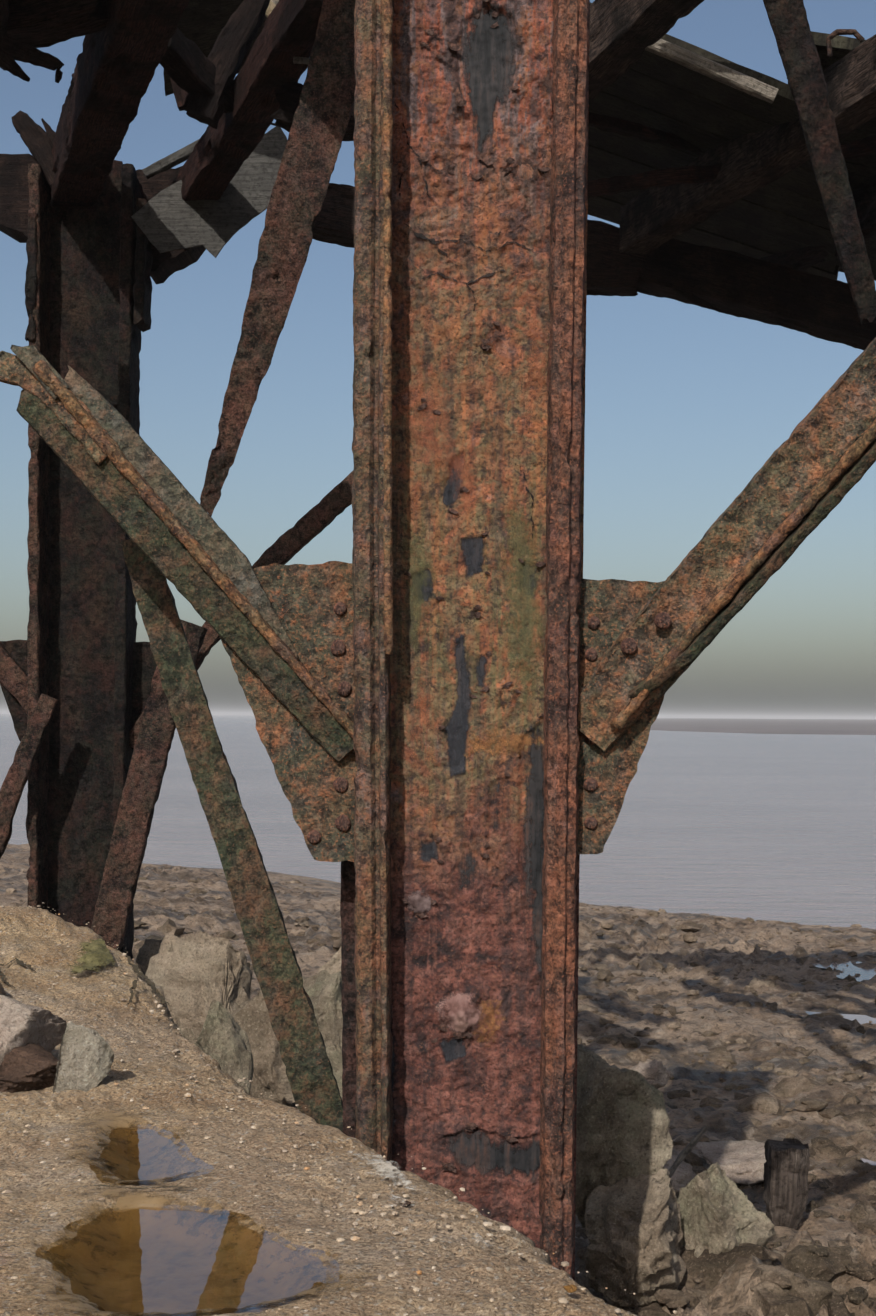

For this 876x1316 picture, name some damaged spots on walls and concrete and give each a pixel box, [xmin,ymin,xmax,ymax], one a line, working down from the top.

peeling [447,0,522,181]
peeling [442,453,469,514]
peeling [461,532,490,576]
peeling [438,634,491,777]